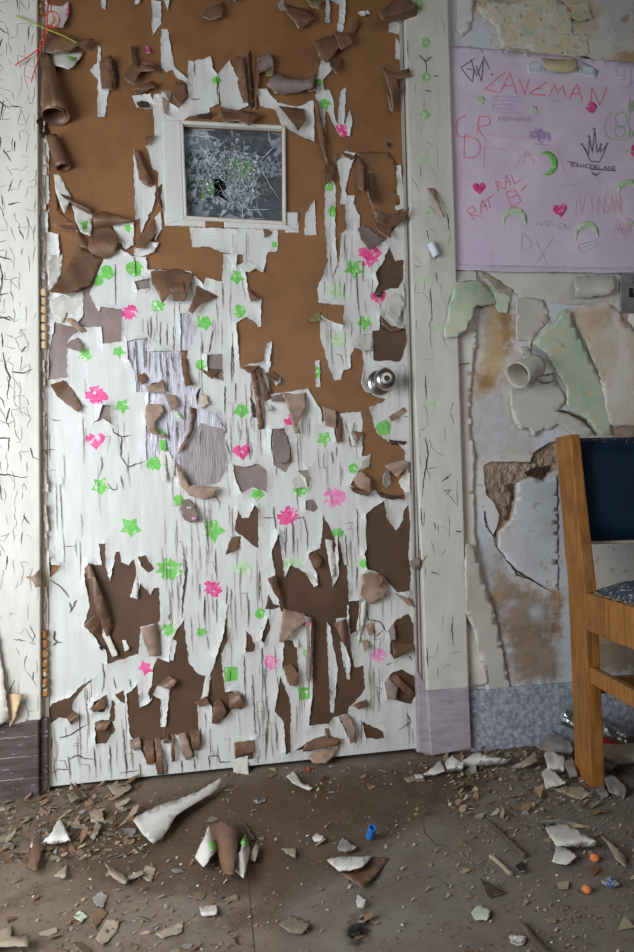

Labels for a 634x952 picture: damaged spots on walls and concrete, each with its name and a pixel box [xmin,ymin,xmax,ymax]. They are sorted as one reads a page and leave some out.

peeling [456,0,590,73]
peeling [26,469,59,639]
crack [0,0,145,713]
peeling [36,0,426,775]
crack [135,233,471,775]
crack [324,41,462,575]
crack [484,489,553,593]
flaking render [444,270,634,690]